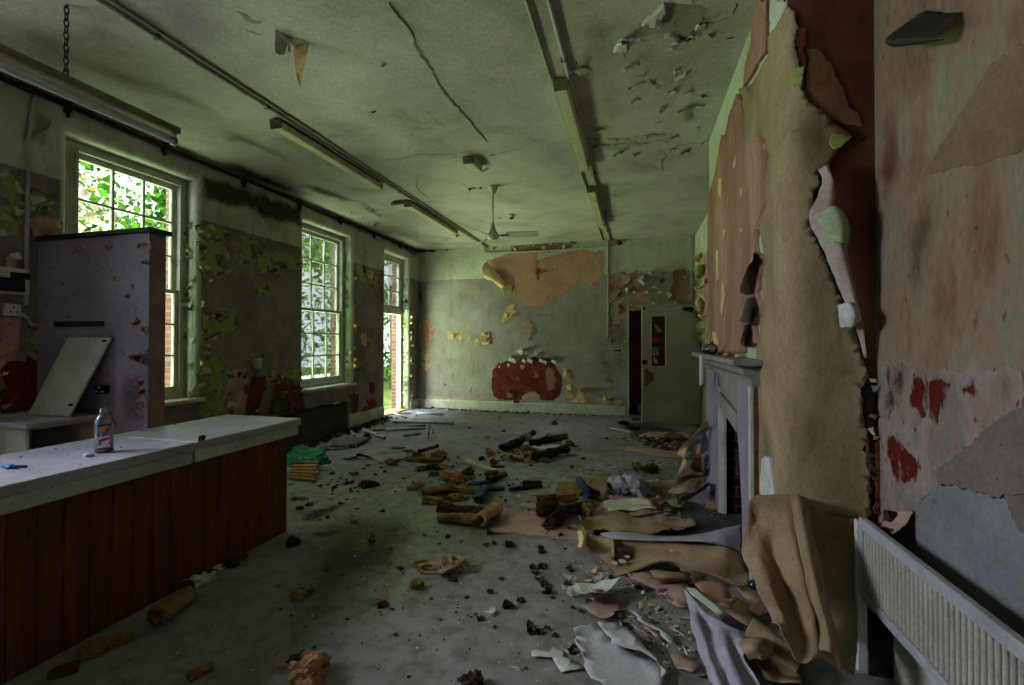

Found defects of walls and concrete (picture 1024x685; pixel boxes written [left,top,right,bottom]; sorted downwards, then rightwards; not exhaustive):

damp [204,164,301,226]
peeling [274,29,309,88]
crack [389,2,517,155]
peeling [613,0,715,54]
peeling [769,0,788,34]
peeling [829,133,852,149]
flaking render [0,283,43,413]
peeling [182,220,305,417]
flaking render [401,278,623,408]
peeling [482,242,678,380]
flaking render [759,456,777,495]
flaking render [861,364,1024,638]